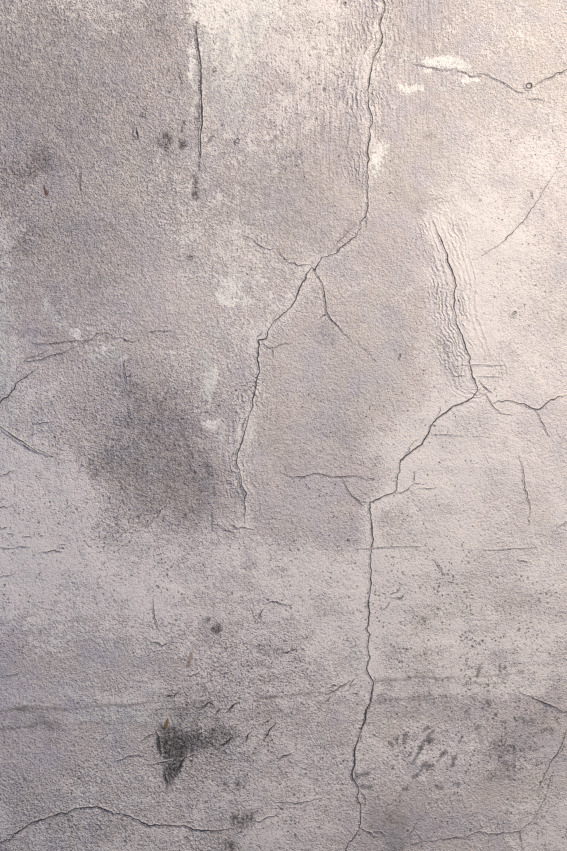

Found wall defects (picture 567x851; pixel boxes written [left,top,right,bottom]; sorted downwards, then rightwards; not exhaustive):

crack [414,63,567,101]
crack [482,169,559,255]
crack [211,0,387,533]
crack [0,329,172,427]
crack [0,505,67,554]
crack [281,220,567,851]
crack [255,600,293,621]
crack [242,716,277,743]
crack [0,796,324,844]